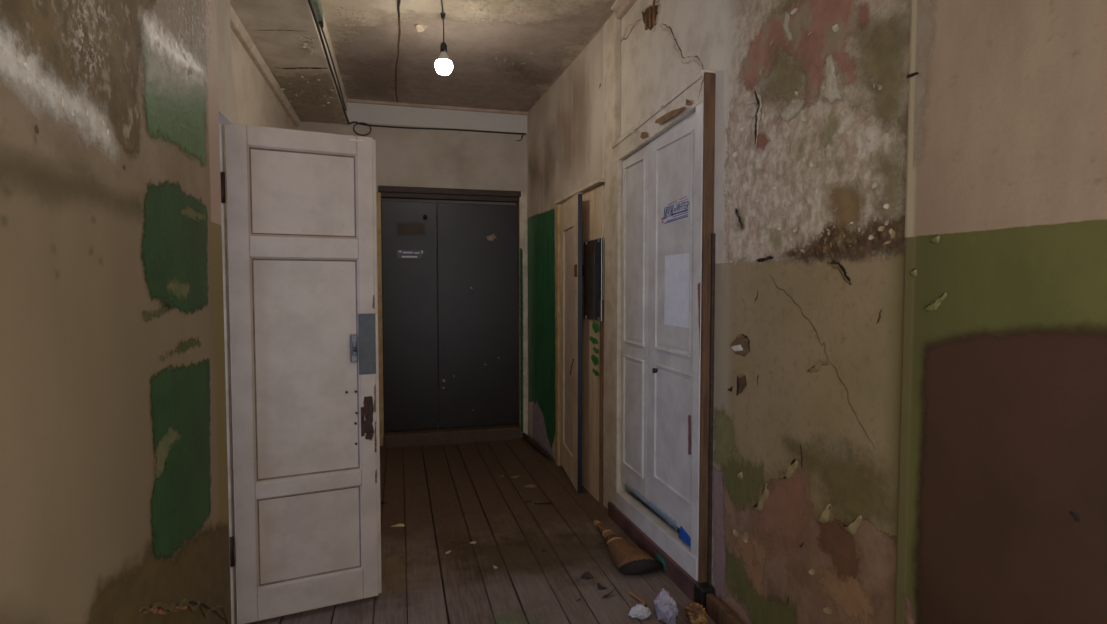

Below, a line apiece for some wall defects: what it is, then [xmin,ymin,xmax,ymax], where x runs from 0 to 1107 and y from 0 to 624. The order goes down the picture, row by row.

crack [620,0,705,100]
flaking render [724,0,907,264]
peeling [728,374,746,396]
peeling [731,334,750,356]
crack [755,256,875,448]
peeling [723,445,915,624]